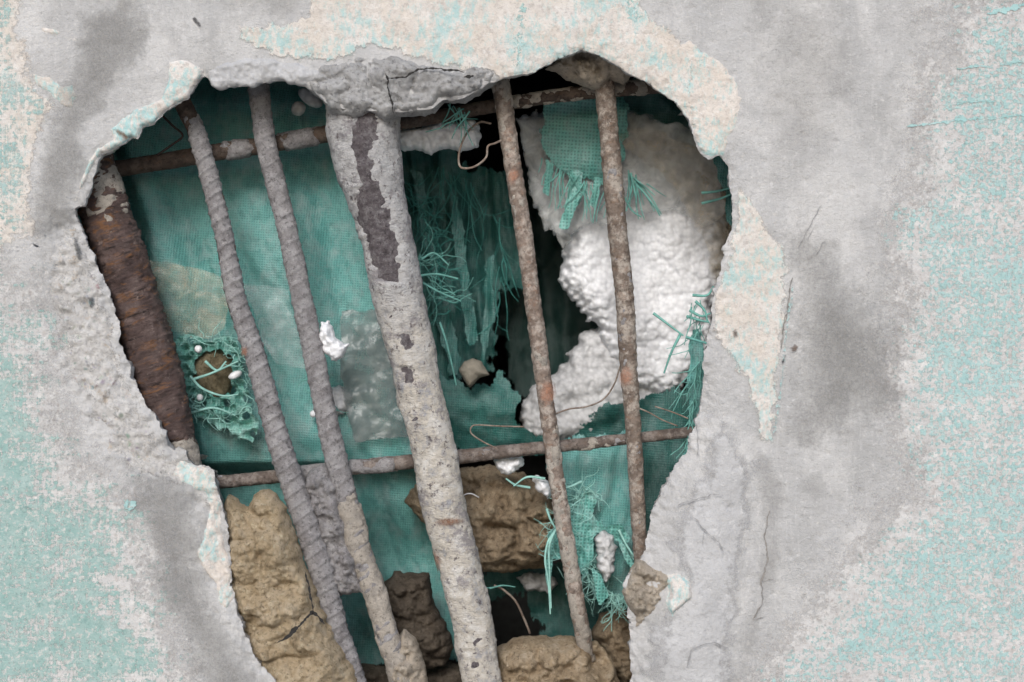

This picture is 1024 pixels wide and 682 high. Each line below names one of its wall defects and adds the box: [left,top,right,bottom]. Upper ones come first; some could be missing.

peeling [0,0,798,682]
crack [385,67,474,111]